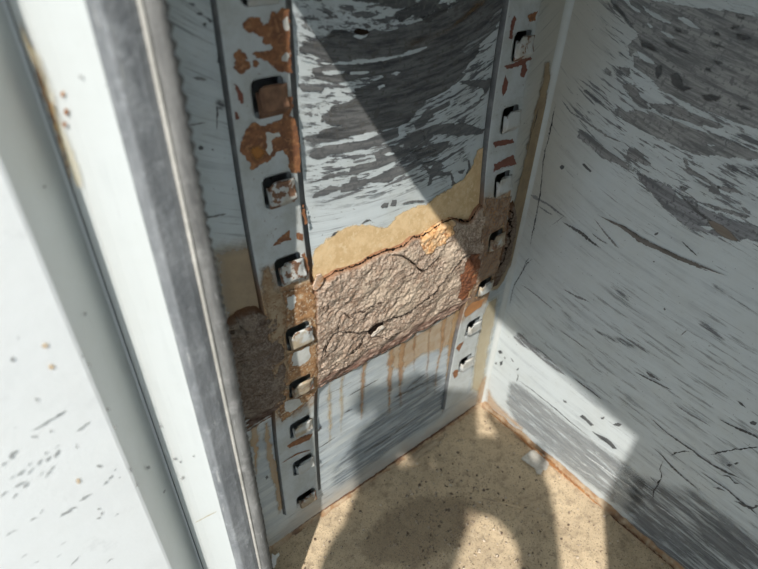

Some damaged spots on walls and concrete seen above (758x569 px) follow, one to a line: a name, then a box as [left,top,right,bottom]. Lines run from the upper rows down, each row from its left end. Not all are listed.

rust [233,7,293,74]
rust [240,96,301,173]
peeling [298,0,503,202]
rust [502,57,532,96]
peeling [572,0,758,247]
rust [277,252,319,422]
crack [322,255,468,384]
peeling [311,204,486,389]
rust [387,196,512,405]
peeling [514,333,563,374]
spalling [602,217,725,276]
crack [638,451,689,498]